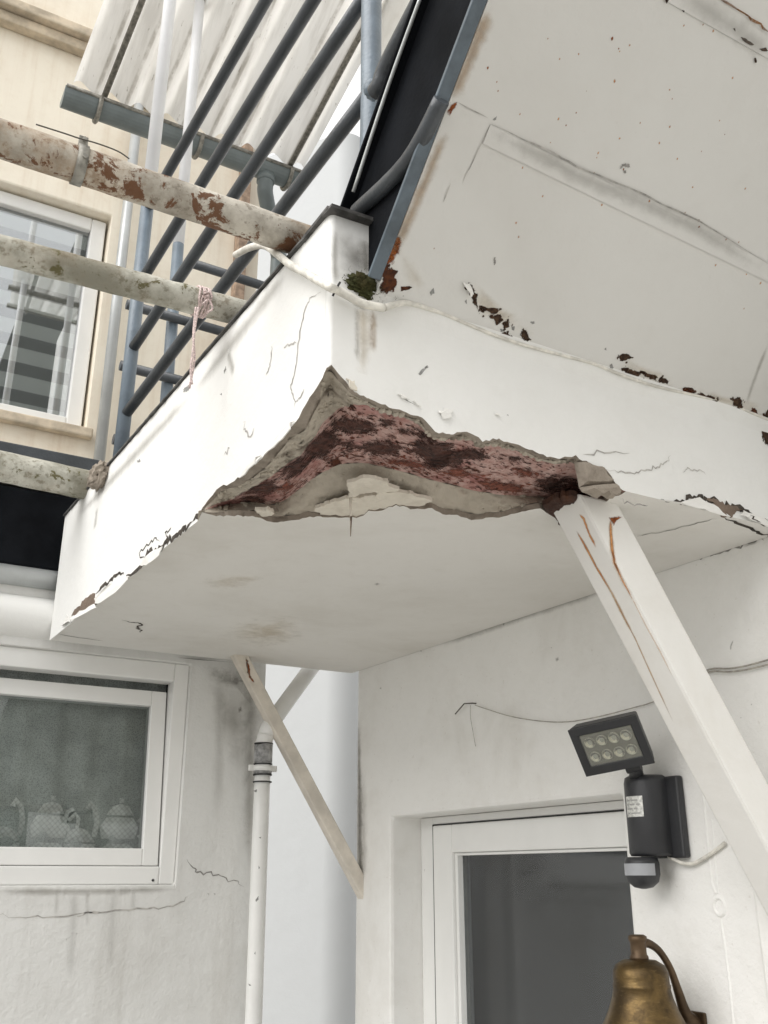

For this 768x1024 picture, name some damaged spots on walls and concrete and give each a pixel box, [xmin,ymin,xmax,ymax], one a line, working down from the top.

corrosion [380,237,412,294]
peeling [463,282,534,341]
crack [266,292,320,405]
peeling [610,354,669,384]
spalling [198,365,625,536]
crack [584,450,768,560]
spalling [62,593,97,626]
corrosion [578,515,663,699]
crack [187,860,240,885]
crack [0,897,186,918]